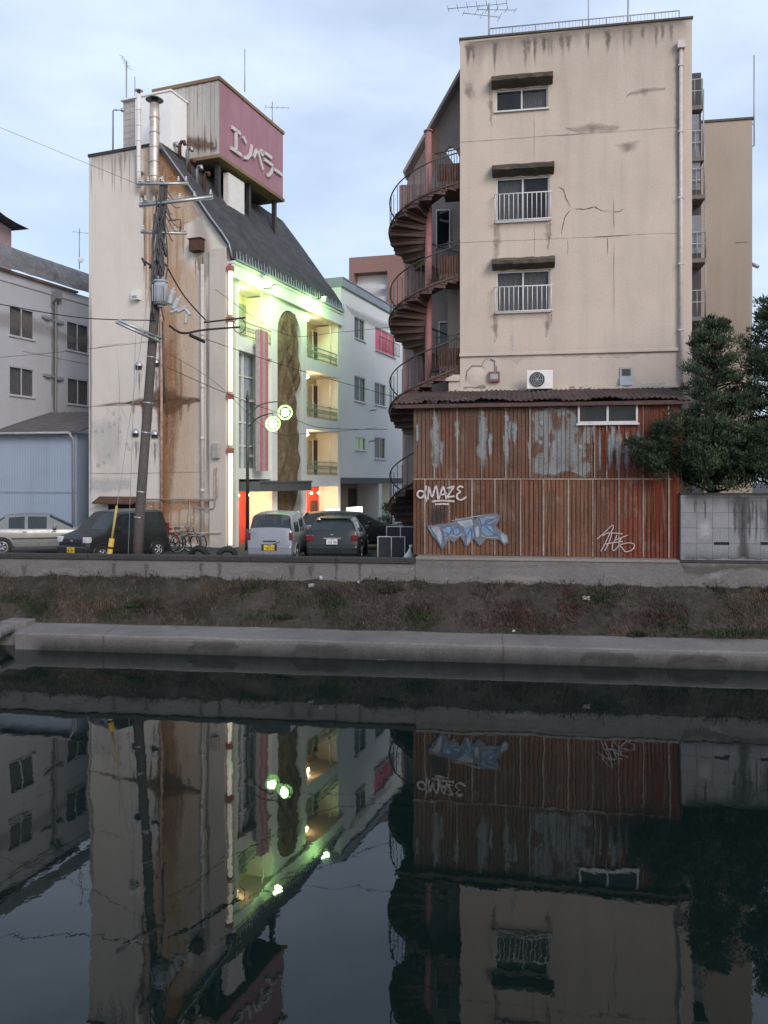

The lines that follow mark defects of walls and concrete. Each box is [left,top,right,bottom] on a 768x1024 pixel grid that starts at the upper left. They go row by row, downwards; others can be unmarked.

crack [463,188,669,248]
corrosion [107,143,209,540]
peeling [430,416,439,468]
peeling [477,411,487,464]
peeling [531,407,629,477]
damp [690,495,768,567]